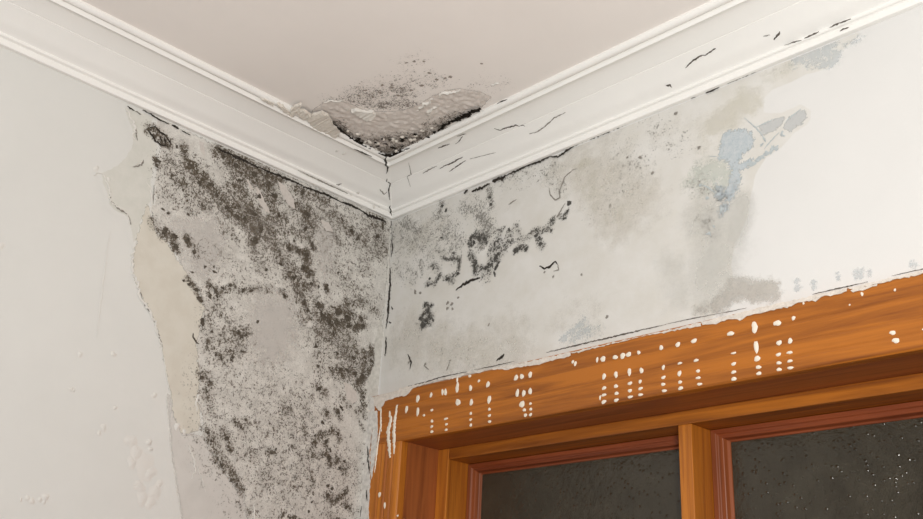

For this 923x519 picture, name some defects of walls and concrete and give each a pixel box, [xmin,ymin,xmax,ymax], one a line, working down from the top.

crack [766,19,850,45]
crack [128,106,190,135]
flaking render [261,82,507,157]
crack [494,113,564,134]
crack [464,126,623,217]
peeling [699,109,808,236]
flaking render [94,102,392,519]
crack [218,134,493,355]
leakage [133,28,870,519]
crack [546,308,745,353]
crack [408,354,514,386]